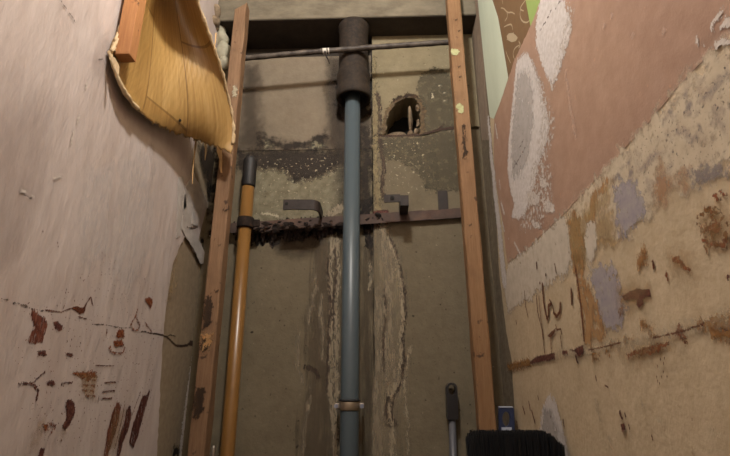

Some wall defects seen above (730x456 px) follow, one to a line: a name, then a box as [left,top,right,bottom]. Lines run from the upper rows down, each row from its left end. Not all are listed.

spalling [380,92,427,137]
spalling [487,0,575,288]
rust [251,219,343,246]
rust [696,189,729,253]
rust [18,284,160,456]
crack [92,324,193,348]
leakage [294,234,342,456]
leakage [361,223,412,456]
rust [618,288,651,319]
crack [653,322,704,339]
spalling [539,393,570,456]